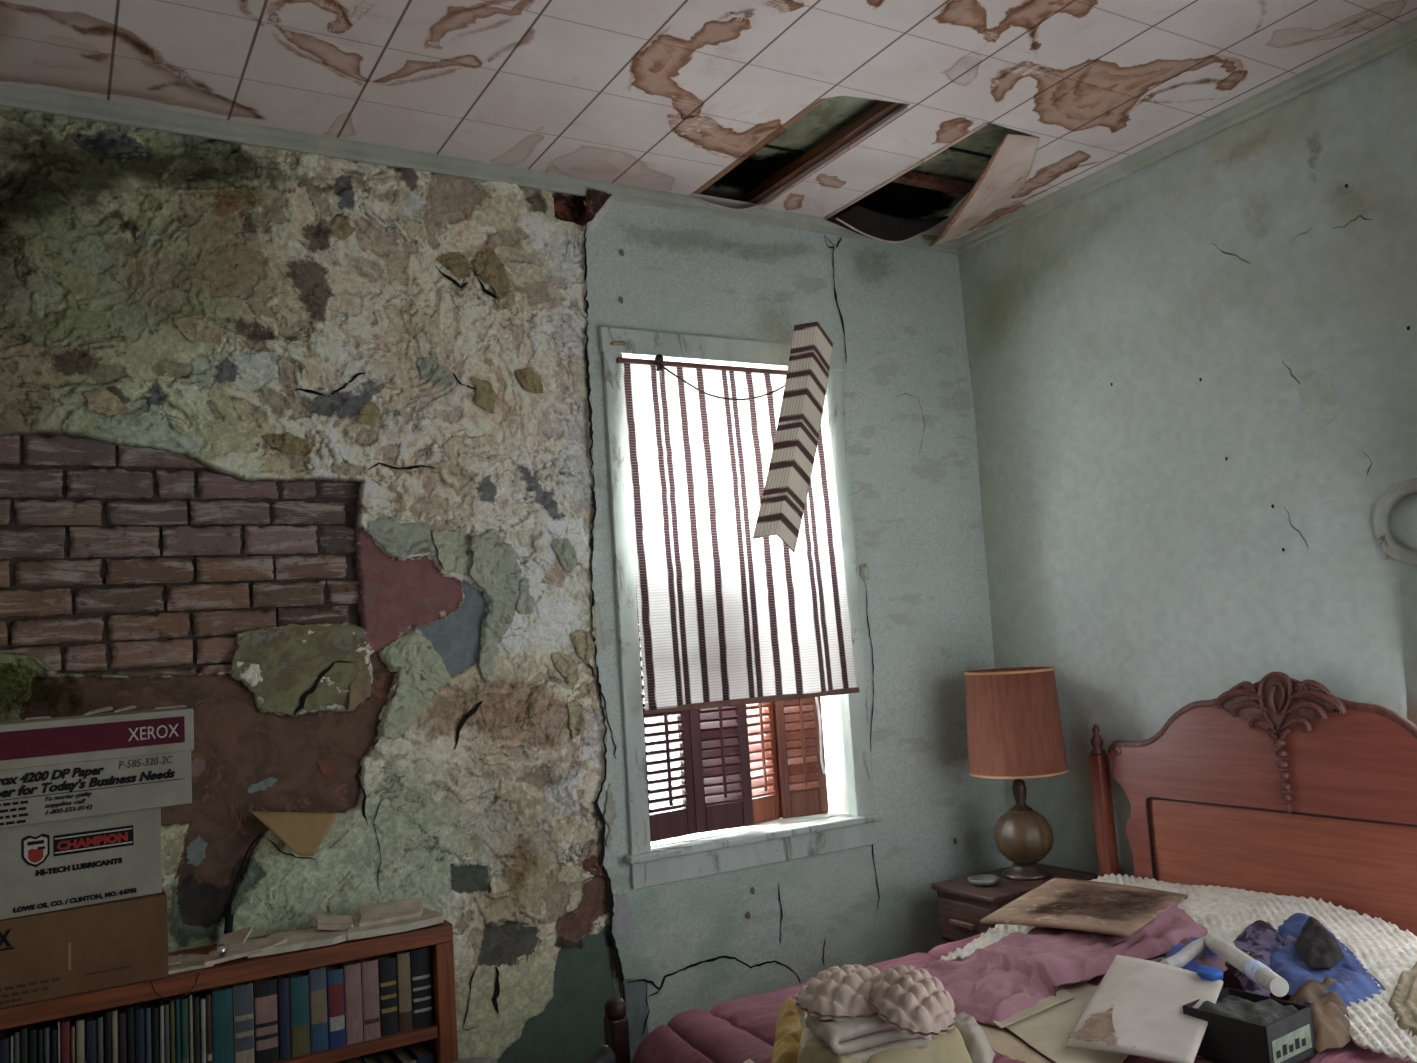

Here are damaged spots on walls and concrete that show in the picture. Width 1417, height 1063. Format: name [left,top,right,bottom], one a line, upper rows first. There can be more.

peeling [286,175,355,324]
spalling [526,189,615,232]
crack [1211,243,1251,264]
crack [824,234,847,363]
peeling [306,379,385,427]
peeling [515,367,543,394]
peeling [519,466,565,521]
crack [1284,507,1309,549]
crack [575,197,825,1037]
flaking render [0,432,536,926]
crack [864,580,874,746]
crack [872,844,880,926]